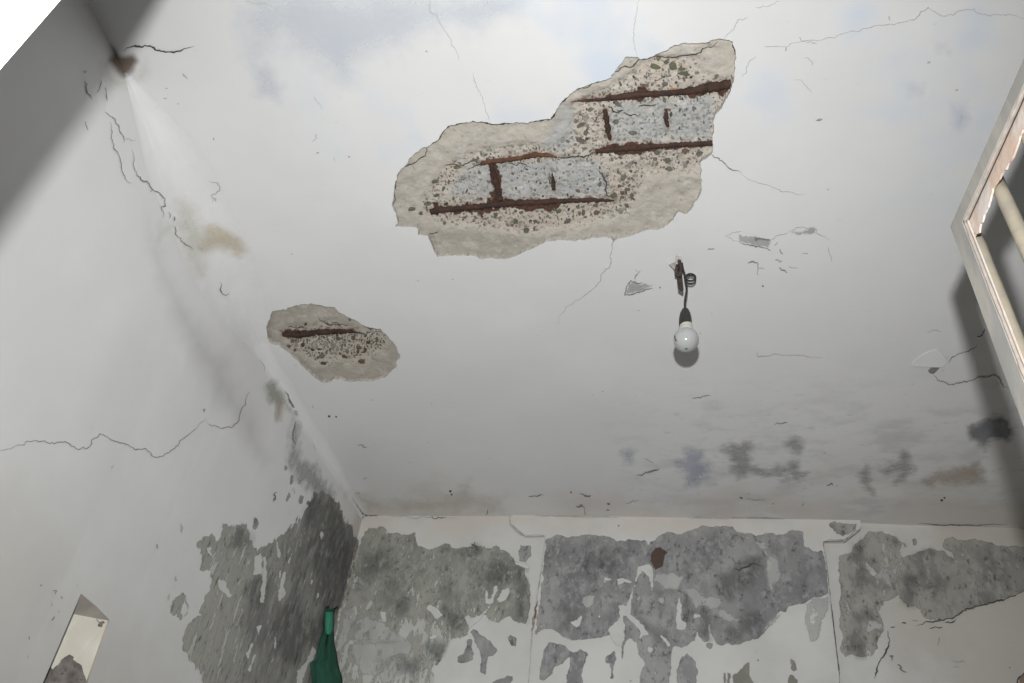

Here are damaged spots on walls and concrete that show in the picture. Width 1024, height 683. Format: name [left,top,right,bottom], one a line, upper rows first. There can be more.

crack [124,45,195,53]
crack [743,7,1024,93]
crack [83,71,204,251]
spalling [392,39,736,259]
crack [712,155,804,195]
crack [558,242,613,321]
spalling [266,303,400,383]
crack [2,393,249,458]
peeling [170,466,1024,683]